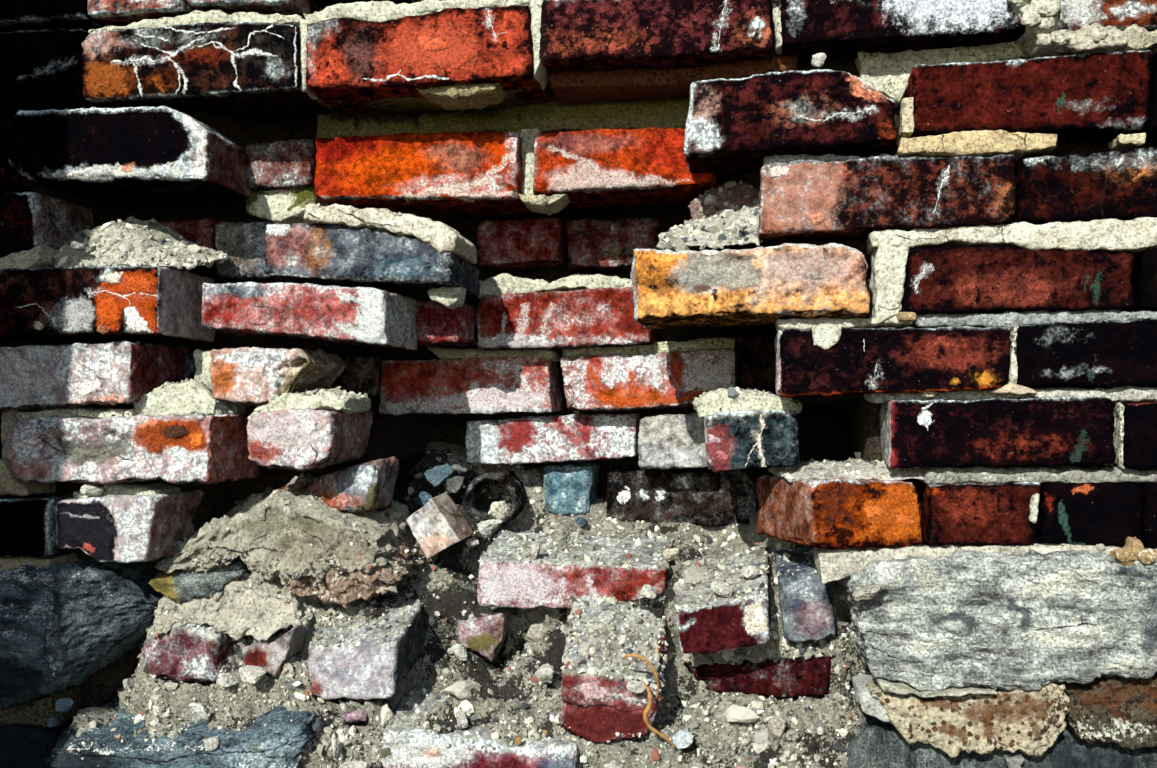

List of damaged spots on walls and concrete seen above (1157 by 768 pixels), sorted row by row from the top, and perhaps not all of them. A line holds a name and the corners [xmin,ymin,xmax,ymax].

damp [882,0,1014,36]
crack [113,24,297,97]
crack [88,290,158,303]
peeling [706,428,729,466]
spalling [415,461,468,506]
peeling [743,600,768,635]
spalling [563,683,650,742]
spalling [381,737,475,768]